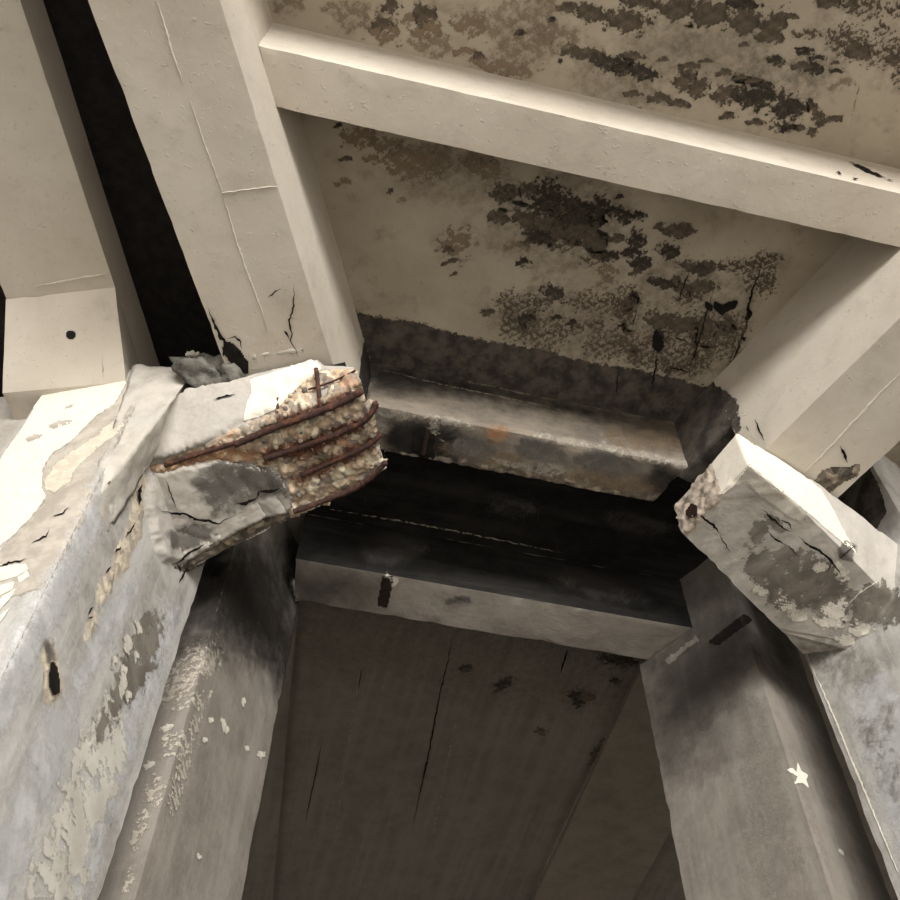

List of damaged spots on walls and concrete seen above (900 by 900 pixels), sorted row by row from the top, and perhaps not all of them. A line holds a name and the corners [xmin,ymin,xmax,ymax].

crack [209,311,248,374]
crack [270,289,298,356]
corrosion [278,390,354,429]
leakage [356,312,742,494]
peeling [0,380,133,621]
crack [157,481,279,525]
corrosion [160,417,376,485]
spalling [83,367,662,643]
spalling [674,463,724,537]
spalling [814,464,860,493]
crack [763,510,855,577]
peeling [25,611,165,900]